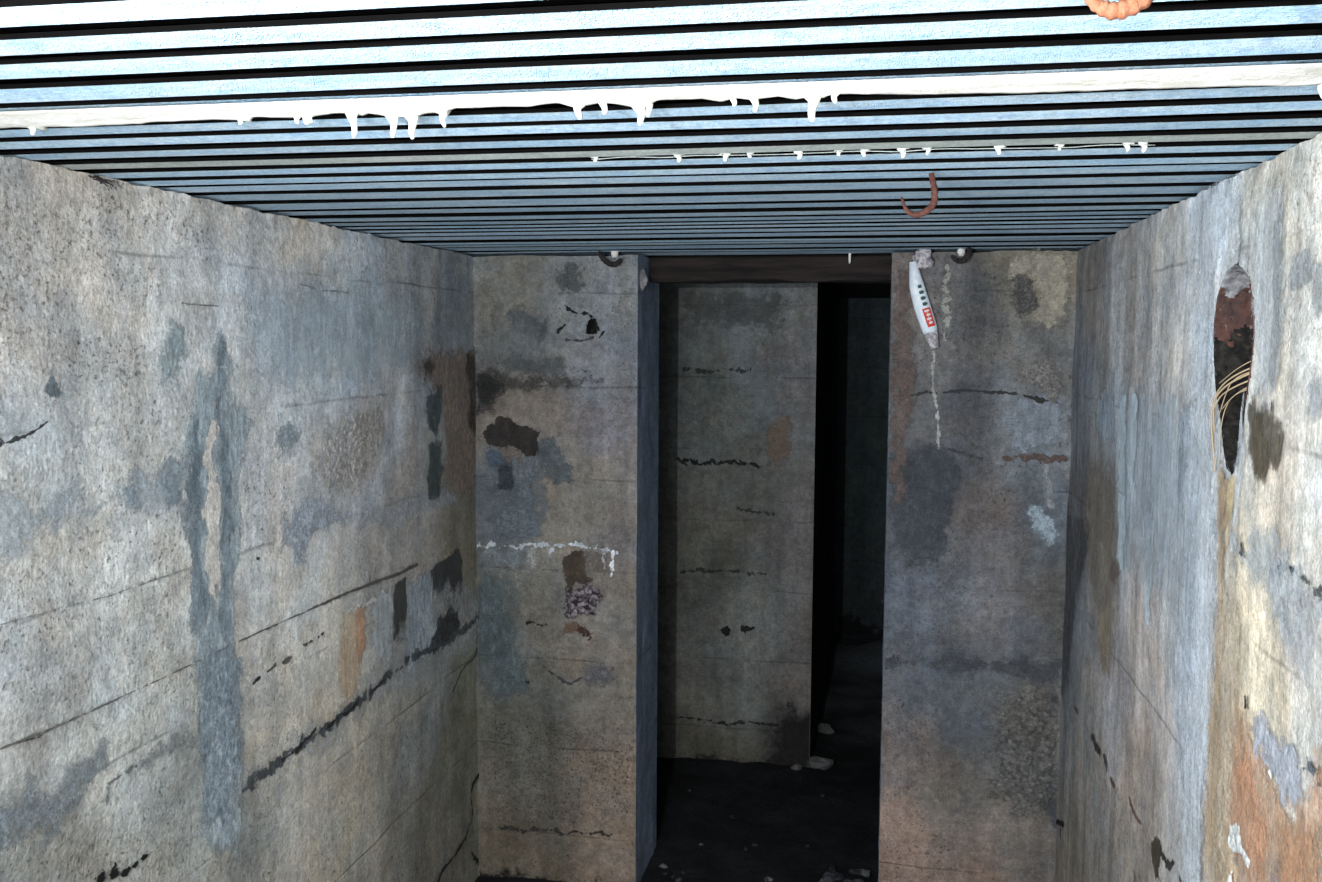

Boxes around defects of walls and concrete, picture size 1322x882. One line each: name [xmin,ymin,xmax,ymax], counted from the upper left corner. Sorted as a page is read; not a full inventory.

water stain [0,63,1322,139]
crack [0,421,48,447]
water stain [890,264,960,567]
water stain [0,319,257,860]
crack [0,563,418,750]
crack [242,615,479,793]
water stain [274,348,618,792]
spalling [563,581,603,619]
water stain [1097,176,1322,882]
rust [1205,461,1322,882]
crack [1272,561,1322,601]
crack [437,773,479,882]